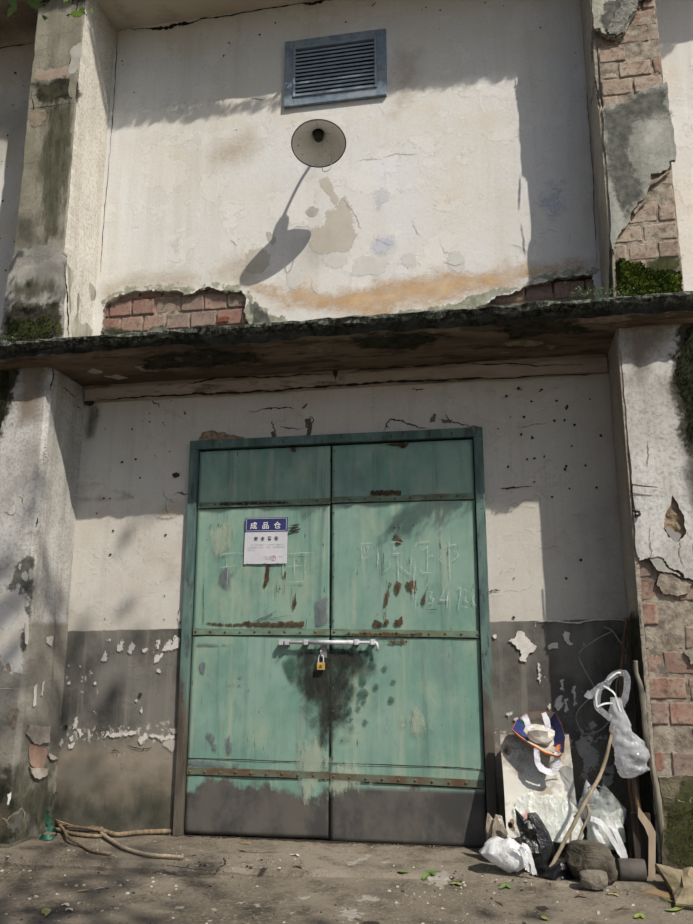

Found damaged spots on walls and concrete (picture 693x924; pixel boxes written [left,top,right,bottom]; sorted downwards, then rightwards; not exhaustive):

flaking render [598,0,662,107]
crack [101,0,325,256]
water stain [22,78,82,242]
flaking render [102,288,249,335]
water stain [101,282,285,324]
water stain [399,267,598,313]
flaking render [664,498,685,542]
rust [345,580,428,645]
flaking render [640,556,693,625]
peeling [101,635,180,673]
peeling [509,631,537,662]
water stain [347,661,387,724]